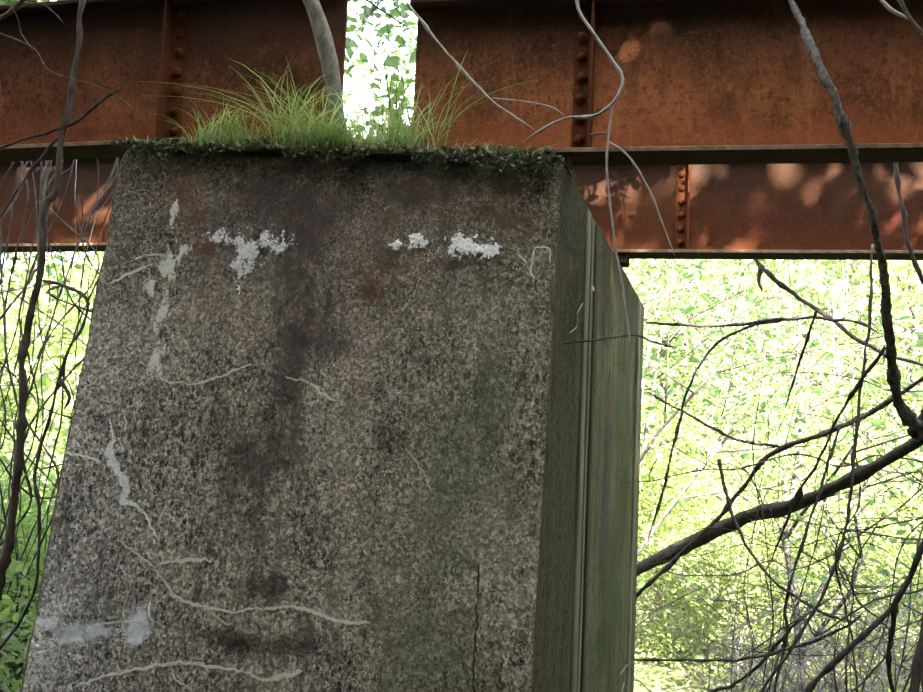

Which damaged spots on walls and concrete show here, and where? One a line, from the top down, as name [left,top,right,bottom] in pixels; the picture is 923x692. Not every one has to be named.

peeling [205,226,297,295]
peeling [388,229,502,260]
crack [472,564,480,692]